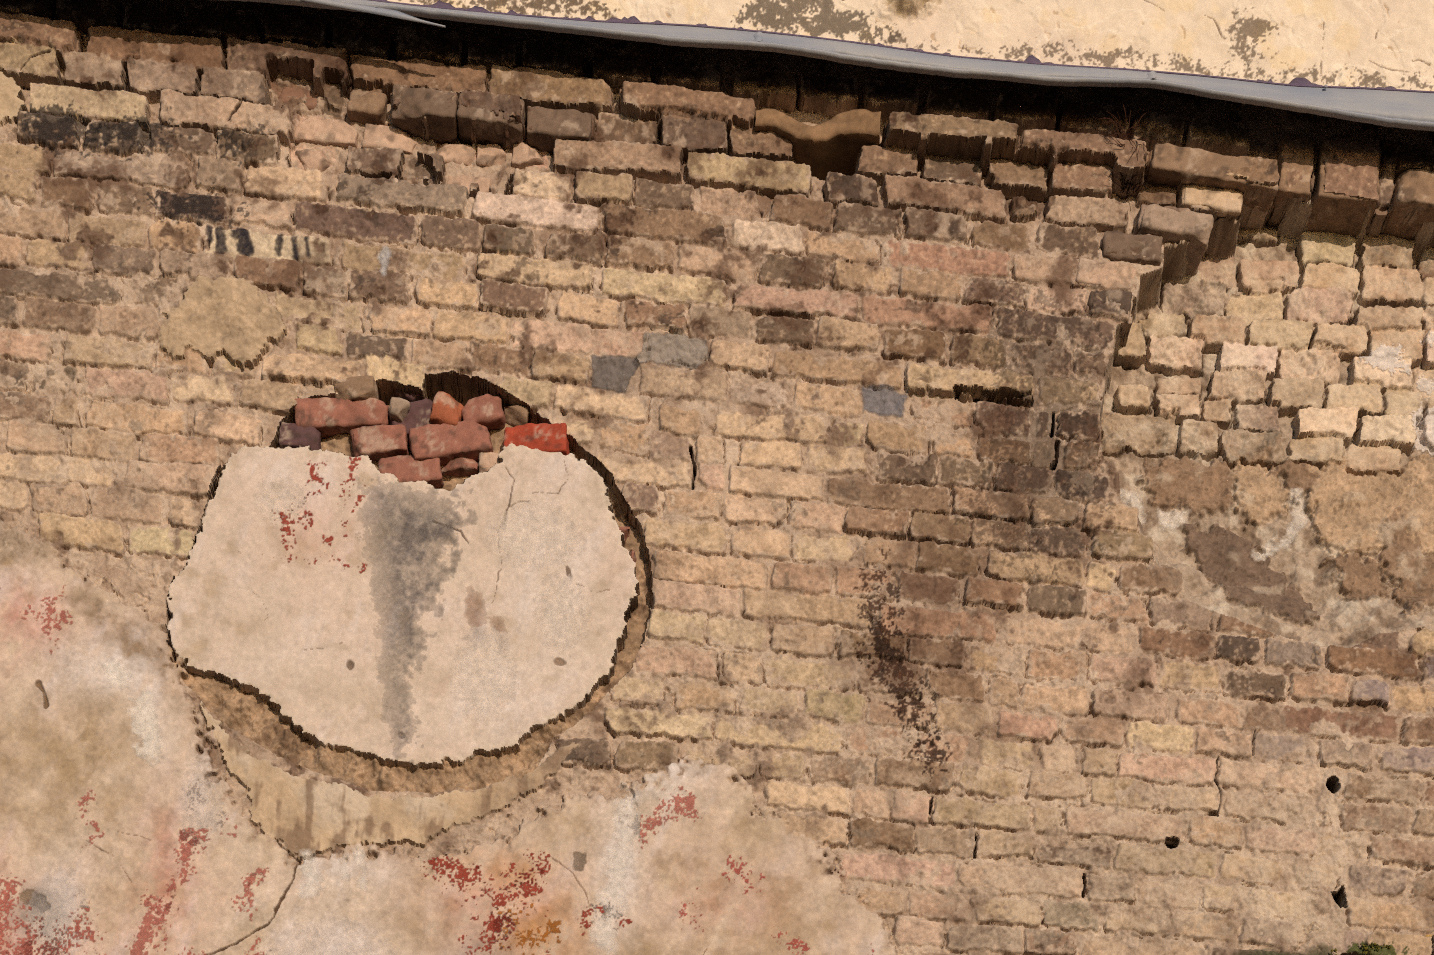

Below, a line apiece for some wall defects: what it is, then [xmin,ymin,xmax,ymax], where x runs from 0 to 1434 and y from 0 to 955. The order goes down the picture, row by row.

leakage [411,0,616,20]
spalling [268,82,554,199]
spalling [1100,192,1434,648]
leakage [386,498,451,635]
crack [211,842,300,955]